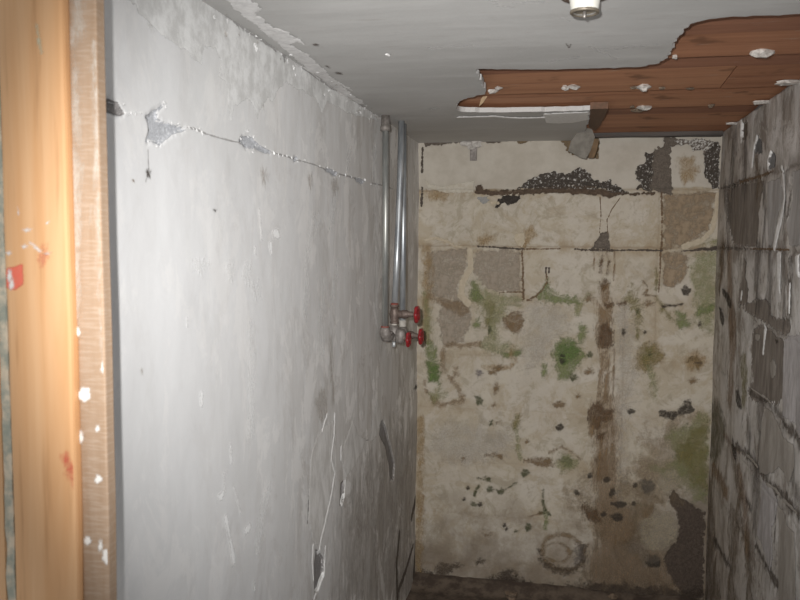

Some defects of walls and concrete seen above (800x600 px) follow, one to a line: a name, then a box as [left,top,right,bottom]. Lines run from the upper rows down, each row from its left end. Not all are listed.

peeling [543,112,590,124]